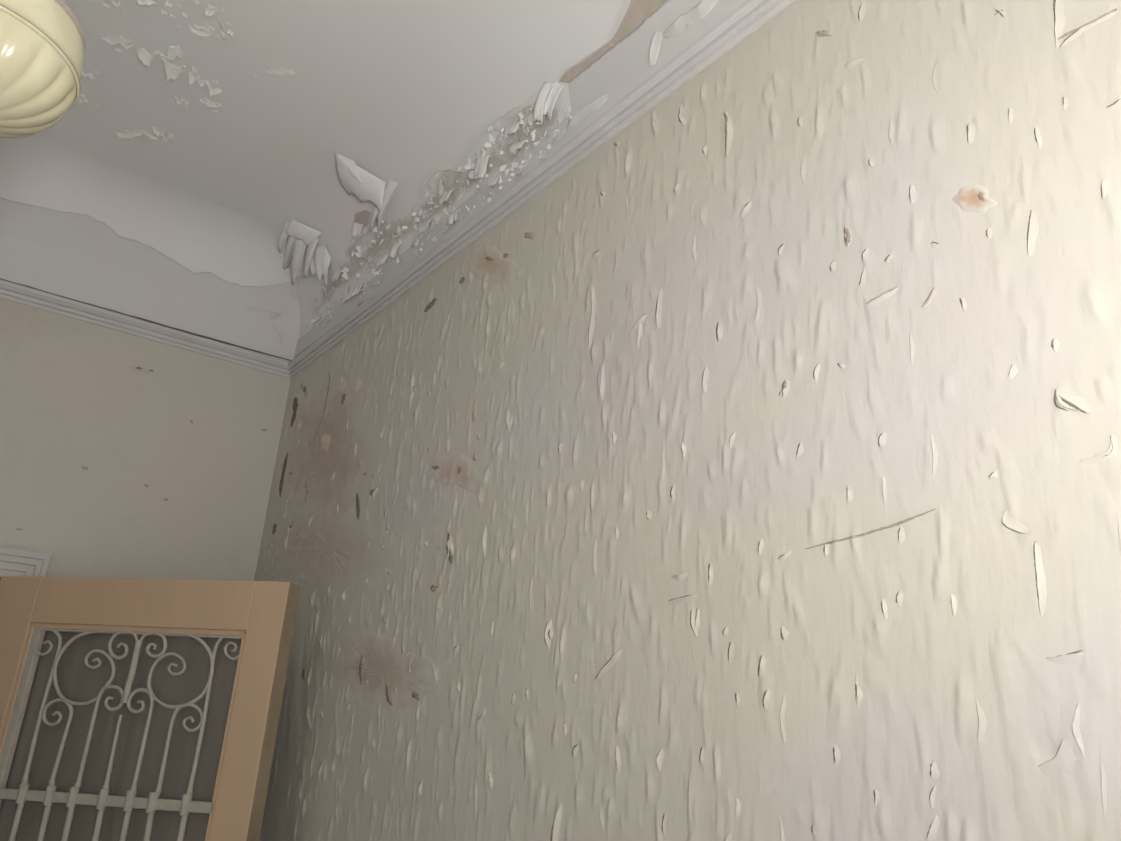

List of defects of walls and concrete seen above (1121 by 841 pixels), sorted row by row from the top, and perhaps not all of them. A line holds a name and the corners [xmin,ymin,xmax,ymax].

peeling [102,0,235,42]
peeling [101,35,222,113]
flaking render [277,0,665,329]
peeling [1054,389,1091,414]